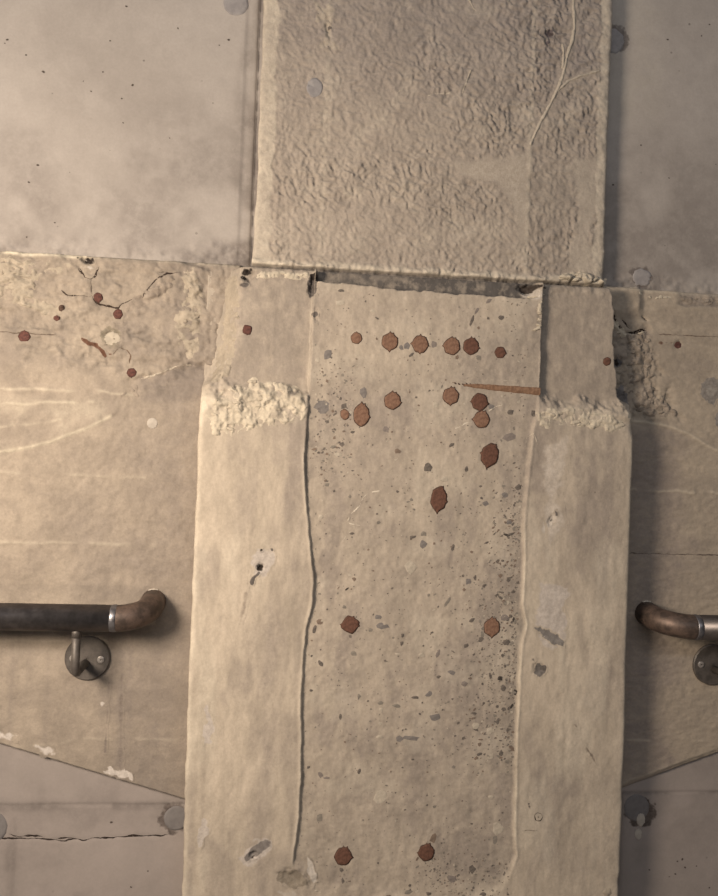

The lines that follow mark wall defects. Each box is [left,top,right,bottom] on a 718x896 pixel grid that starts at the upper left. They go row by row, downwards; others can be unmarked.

crack [61,265,177,309]
spalling [614,321,677,417]
spalling [205,267,625,787]
damp [99,671,134,782]
crack [2,834,170,842]
spalling [234,836,274,871]
spalling [275,856,351,896]
spalling [401,788,511,896]